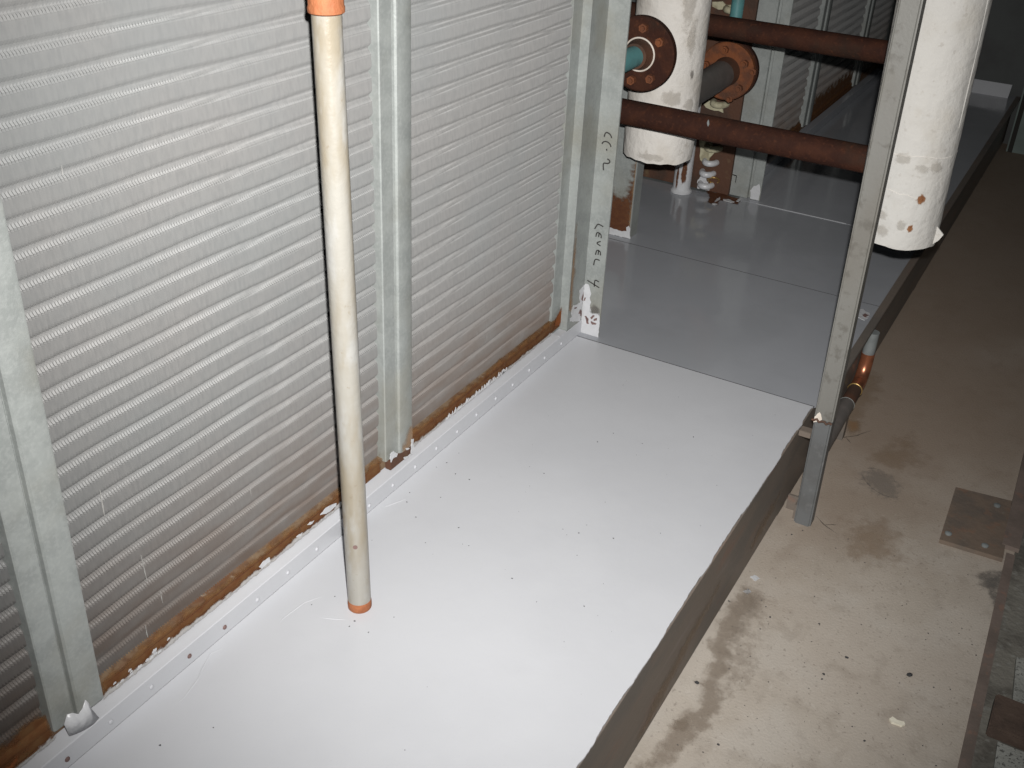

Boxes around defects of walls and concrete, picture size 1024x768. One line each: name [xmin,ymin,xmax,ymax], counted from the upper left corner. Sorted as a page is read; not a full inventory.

corrosion [790,70,854,132]
corrosion [610,161,637,231]
corrosion [402,251,575,452]
corrosion [365,459,383,484]
corrosion [101,491,342,695]
corrosion [0,716,55,768]